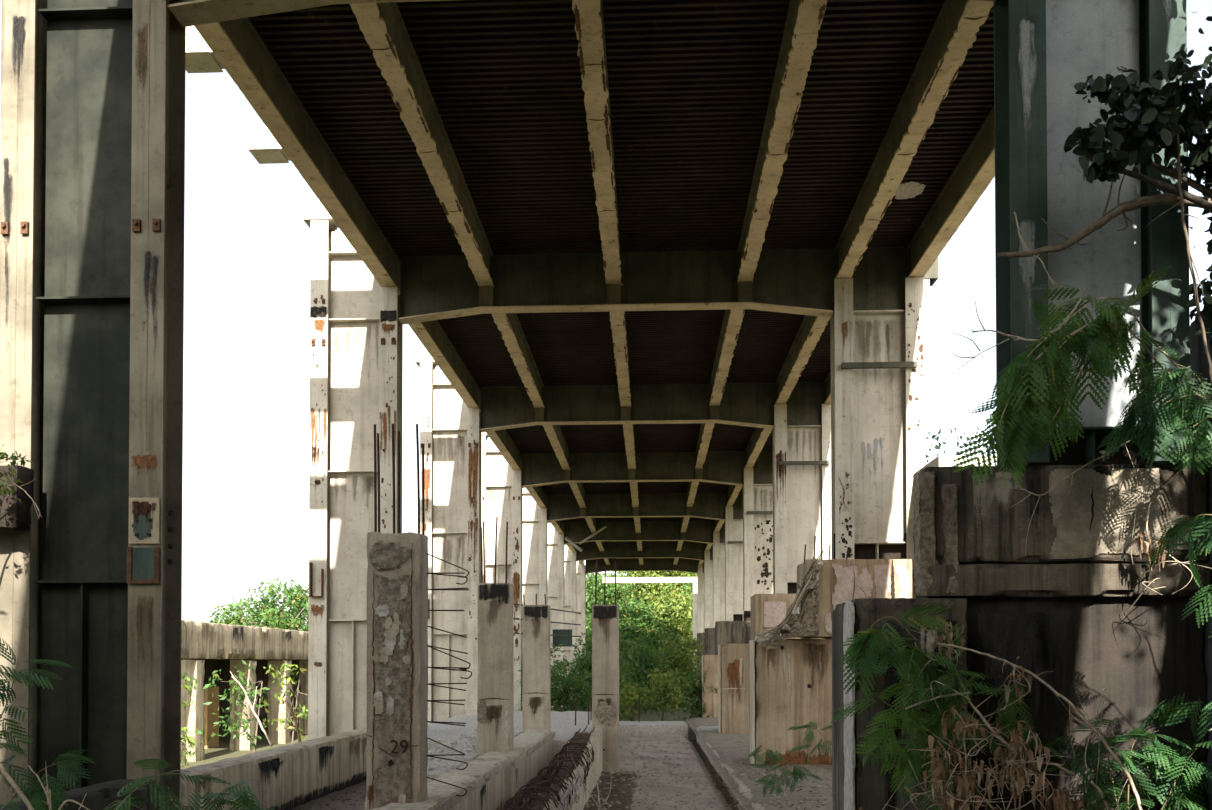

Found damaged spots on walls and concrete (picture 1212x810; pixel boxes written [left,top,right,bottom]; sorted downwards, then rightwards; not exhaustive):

water stain [1020,19,1034,125]
rust [314,319,325,332]
rust [310,408,327,485]
spalling [370,357,412,808]
spalling [416,424,429,535]
rust [468,447,484,583]
peeling [755,520,786,650]
spalling [804,471,959,634]
crack [1051,487,1188,562]
water stain [259,758,283,782]
water stain [270,772,366,810]
water stain [319,746,334,767]